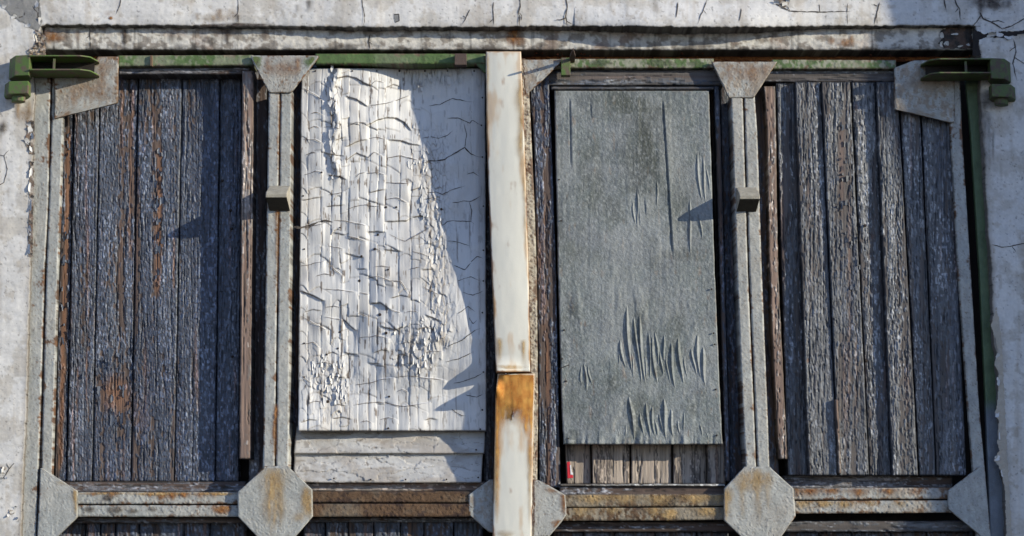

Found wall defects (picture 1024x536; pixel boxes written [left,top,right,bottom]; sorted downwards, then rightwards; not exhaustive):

crack [944,0,1023,80]
peeling [61,215,71,266]
peeling [148,137,166,254]
crack [294,76,482,423]
peeling [97,348,132,457]
corrosion [495,366,534,501]
peeling [991,307,1012,536]
corrosion [652,495,677,518]
corrosion [689,491,728,515]